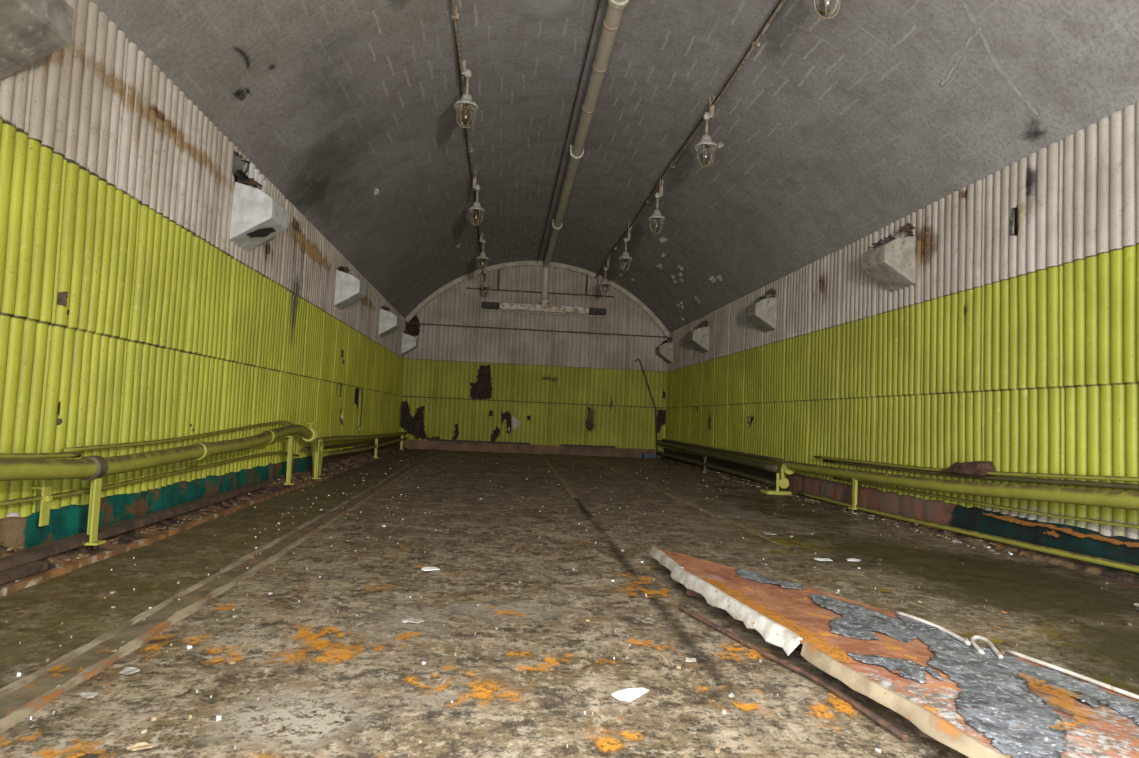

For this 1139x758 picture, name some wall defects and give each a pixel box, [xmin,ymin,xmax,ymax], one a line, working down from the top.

rust [97,69,221,179]
rust [292,219,329,268]
rust [915,227,937,262]
spalling [399,400,459,440]
spalling [469,365,531,441]
peeling [983,506,1139,547]